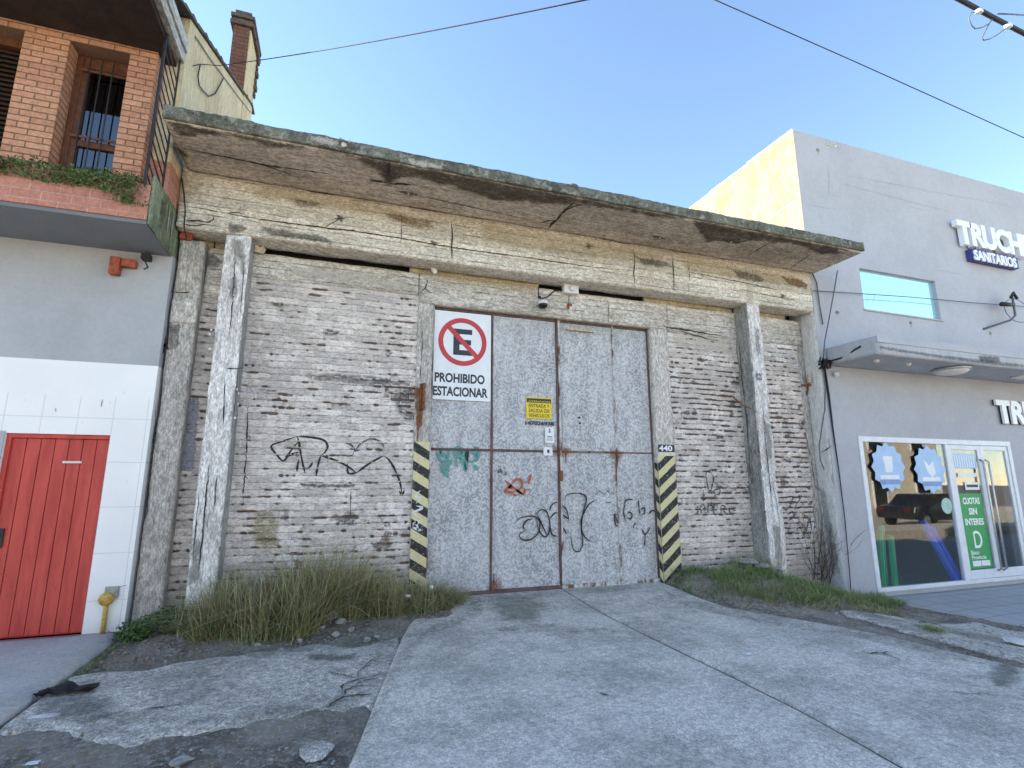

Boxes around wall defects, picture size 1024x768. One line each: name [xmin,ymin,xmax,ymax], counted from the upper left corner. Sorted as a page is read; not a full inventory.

crack [176,193,635,282]
water stain [314,137,848,254]
corrosion [414,387,423,441]
crack [192,463,217,573]
crack [327,654,385,708]